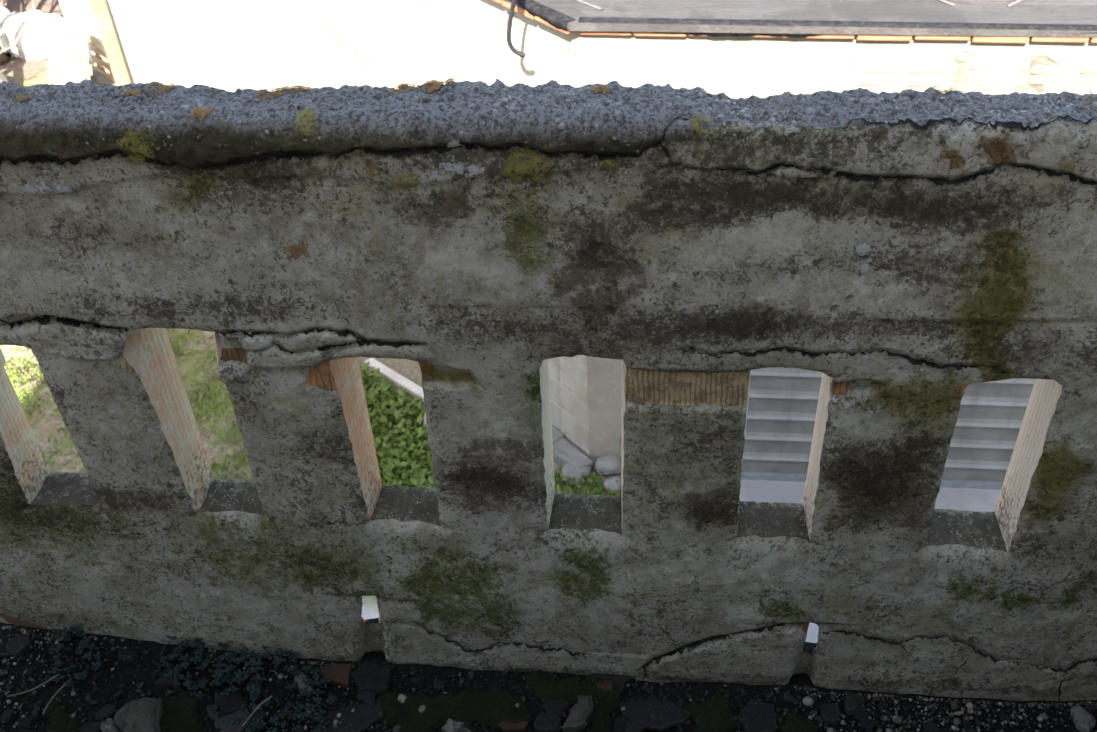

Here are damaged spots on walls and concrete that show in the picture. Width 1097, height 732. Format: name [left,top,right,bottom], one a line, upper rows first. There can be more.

crack [0,115,1097,185]
crack [0,315,129,331]
crack [217,328,422,354]
crack [636,347,1018,374]
crack [387,619,598,672]
crack [642,623,786,678]